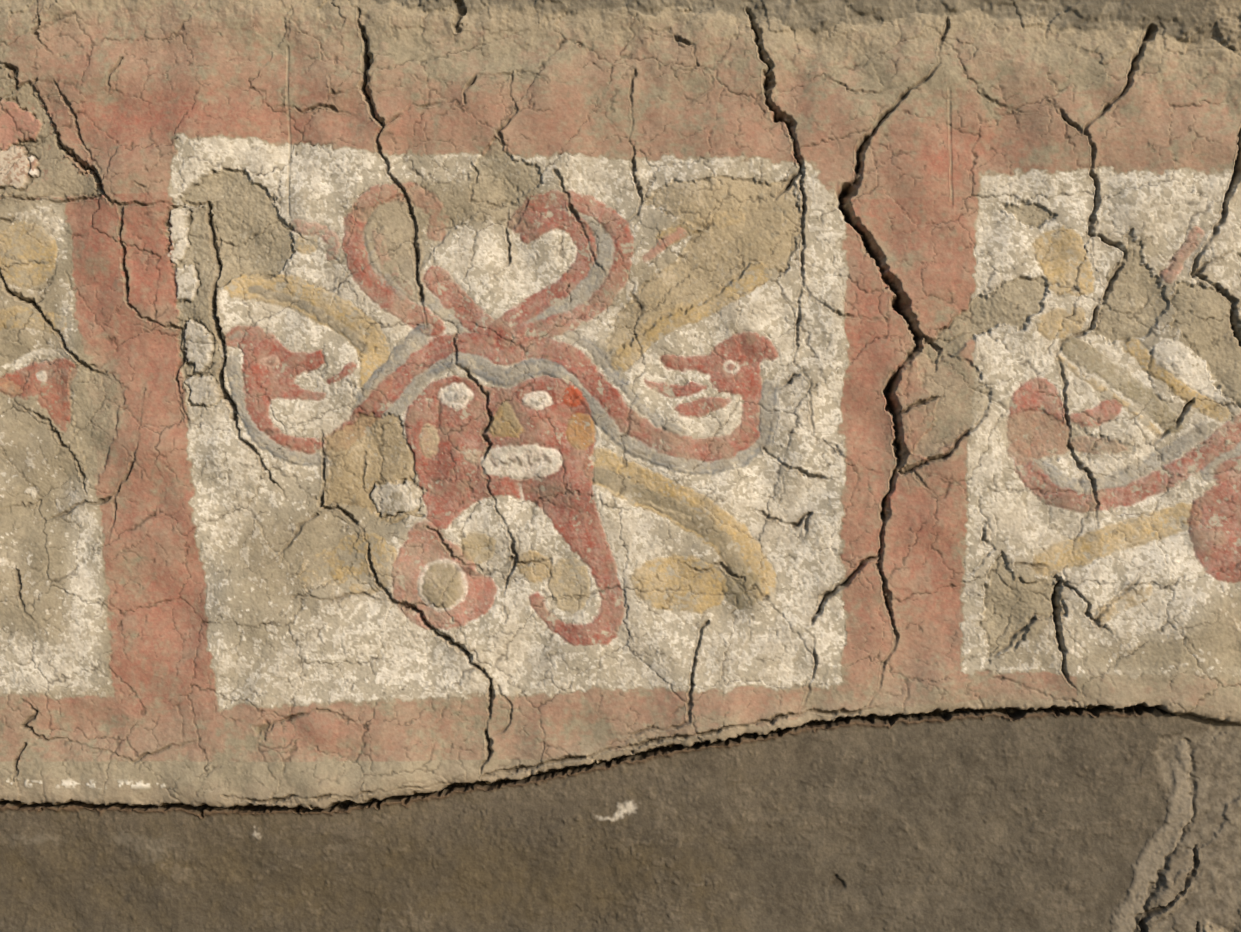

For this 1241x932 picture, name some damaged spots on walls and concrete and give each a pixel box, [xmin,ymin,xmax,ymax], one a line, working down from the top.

crack [0,268,147,542]
crack [0,0,288,499]
crack [272,5,554,627]
crack [744,6,888,466]
crack [798,15,989,711]
crack [969,21,1159,530]
crack [1189,124,1241,353]
peeling [6,779,172,790]
peeling [251,719,274,745]
crack [0,429,1176,819]
peeling [828,874,852,892]
flaking render [1110,723,1241,932]